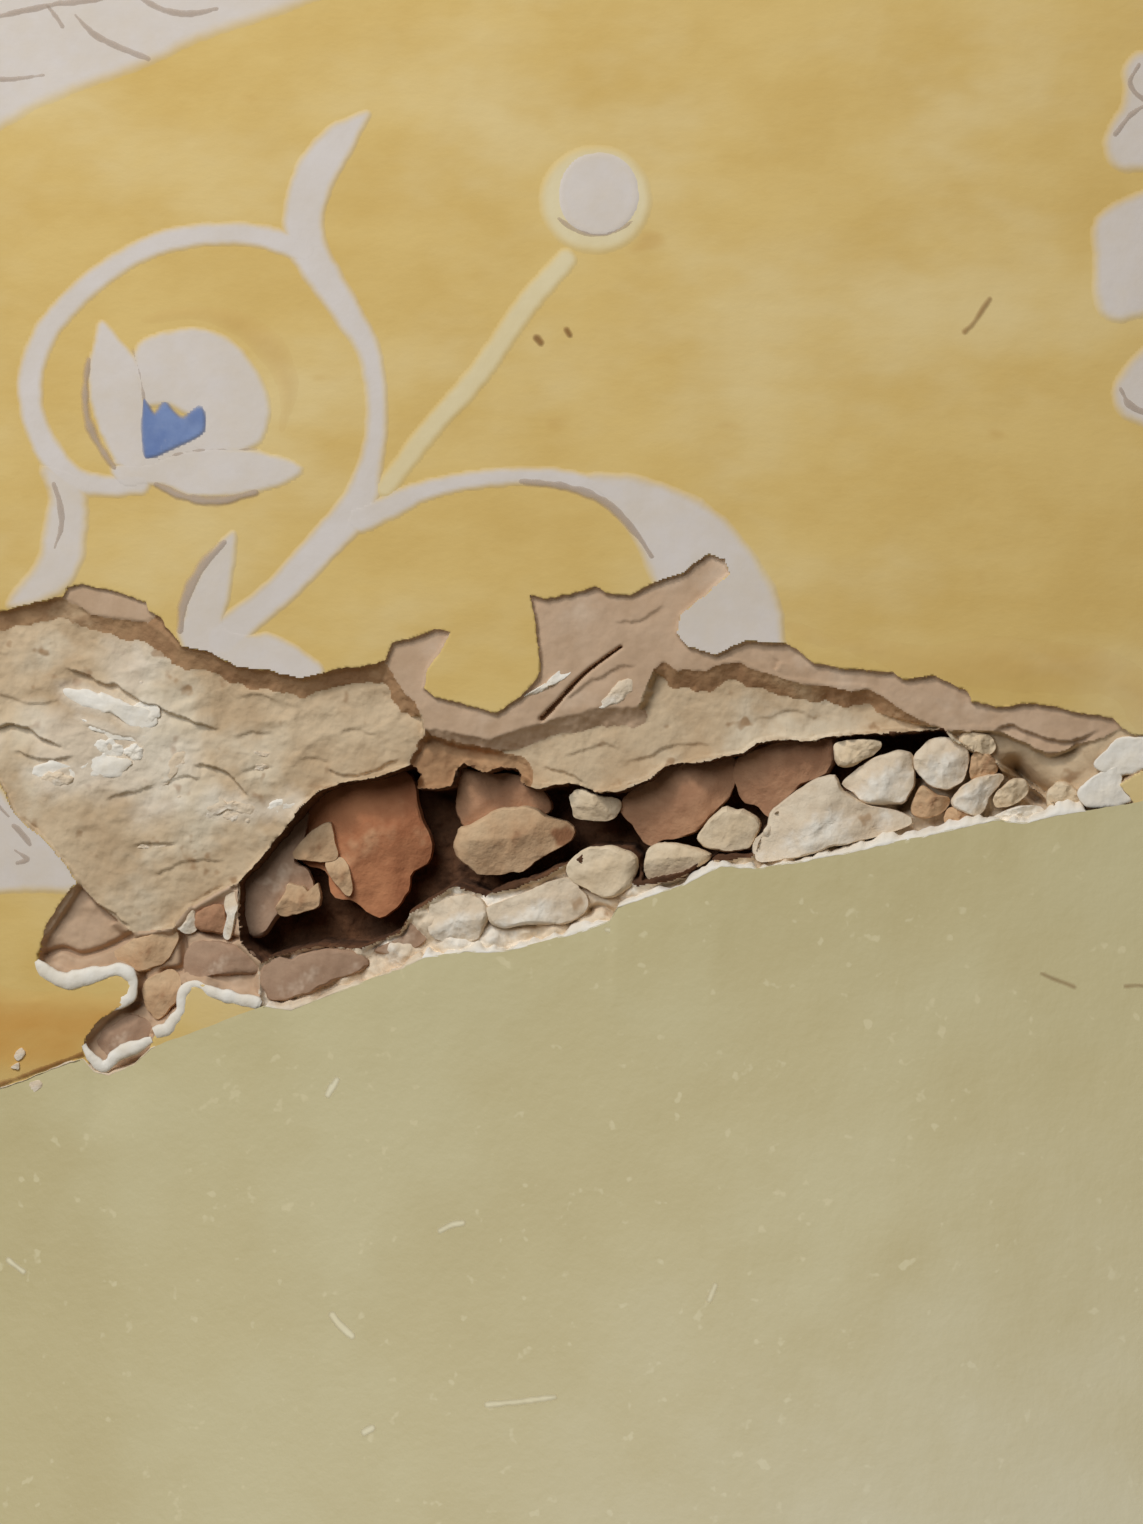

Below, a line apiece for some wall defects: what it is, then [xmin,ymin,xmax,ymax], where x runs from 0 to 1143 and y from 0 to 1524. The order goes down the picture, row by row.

spalling [0,554,1143,1076]